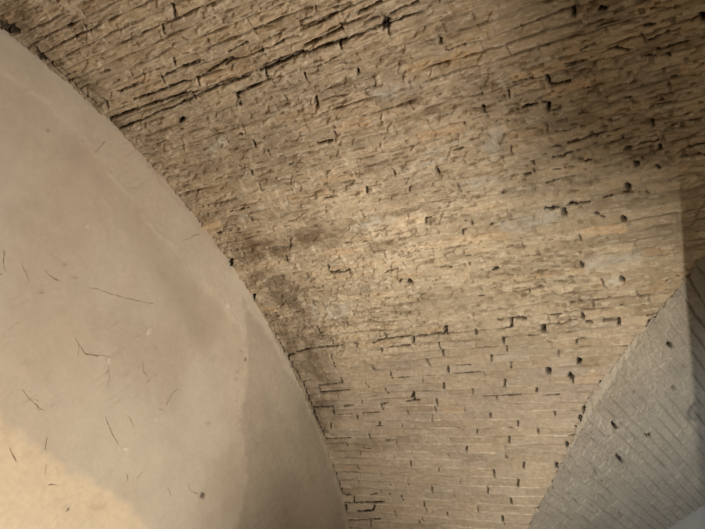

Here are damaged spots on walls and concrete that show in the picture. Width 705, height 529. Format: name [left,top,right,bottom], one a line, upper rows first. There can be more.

damp [56,120,513,529]